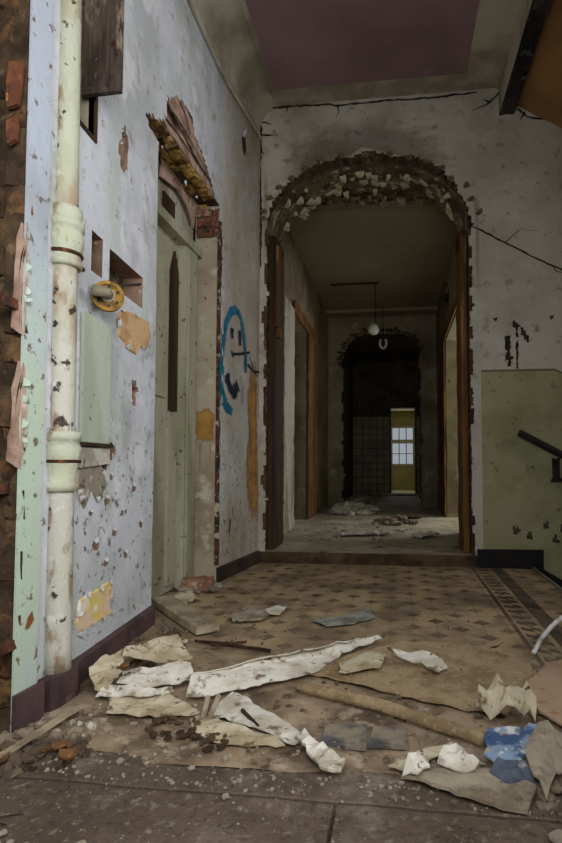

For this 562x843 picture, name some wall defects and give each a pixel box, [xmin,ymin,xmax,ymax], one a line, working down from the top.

crack [517,108,547,121]
crack [260,91,499,267]
crack [467,224,562,273]
flaking render [0,0,33,644]
peeling [117,309,151,355]
flaking render [259,150,483,556]
peeling [77,464,113,516]
peeling [75,578,115,638]
flaking render [0,651,12,733]